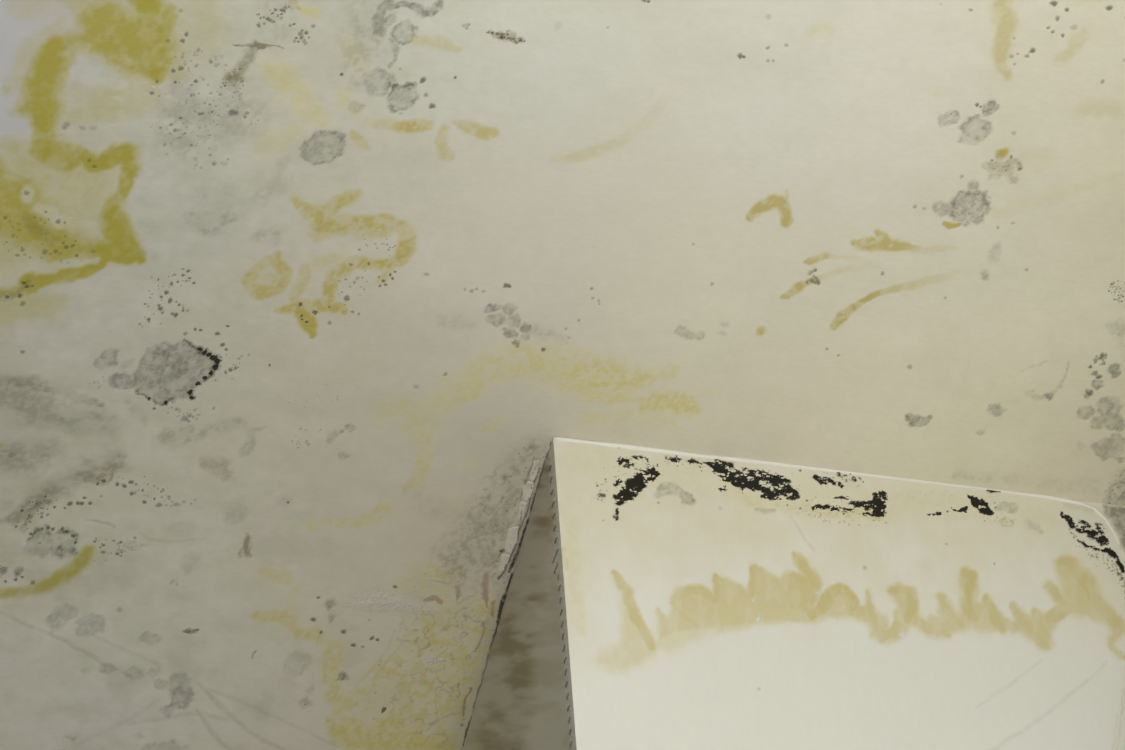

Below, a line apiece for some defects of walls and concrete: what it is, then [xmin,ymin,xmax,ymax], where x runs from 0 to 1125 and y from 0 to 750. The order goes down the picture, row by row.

water stain [485,28,528,45]
water stain [968,0,1036,84]
water stain [0,0,501,483]
water stain [743,189,796,230]
water stain [778,226,961,332]
water stain [912,88,1119,282]
water stain [290,282,719,482]
water stain [903,412,934,429]
water stain [1074,352,1125,464]
water stain [561,442,1125,680]
water stain [219,498,506,750]
water stain [79,660,196,717]